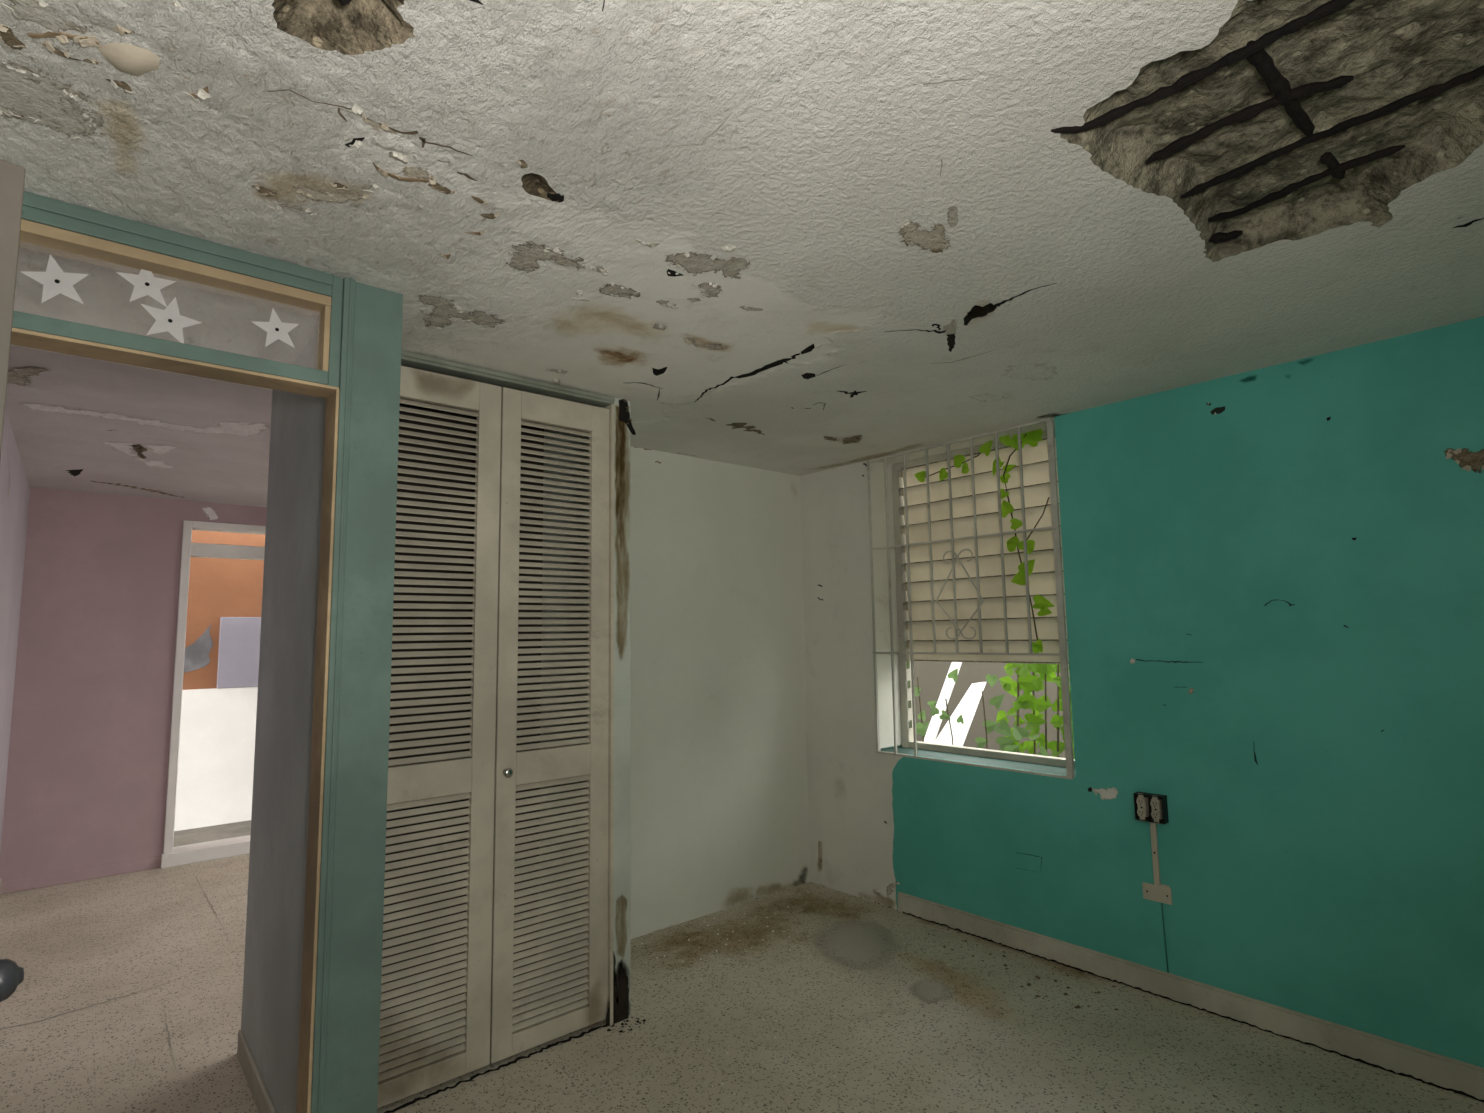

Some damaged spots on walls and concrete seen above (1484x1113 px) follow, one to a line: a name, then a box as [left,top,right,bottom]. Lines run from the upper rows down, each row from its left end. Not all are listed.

spalling [272,0,415,55]
peeling [0,0,138,141]
peeling [183,86,211,101]
spalling [1051,0,1484,262]
spalling [516,160,559,202]
peeling [899,206,958,253]
peeling [418,295,504,329]
peeling [505,238,750,330]
crack [993,283,1056,307]
crack [886,324,993,363]
crack [695,344,866,435]
water stain [606,951,629,1027]